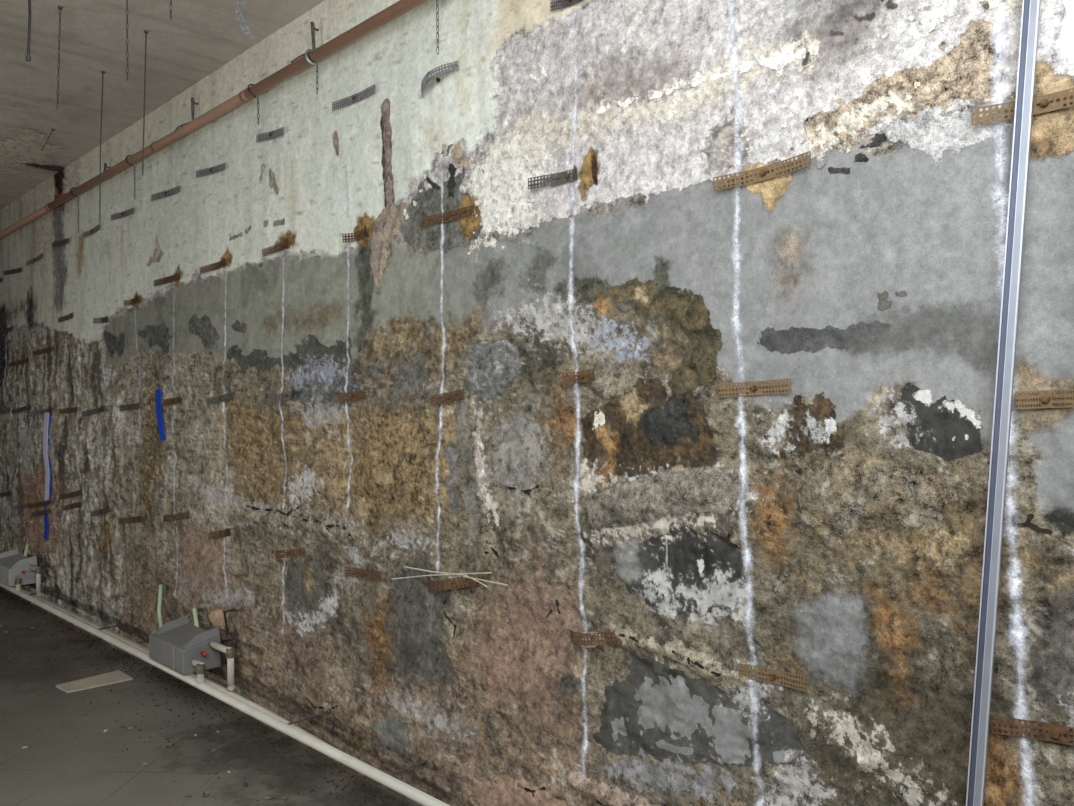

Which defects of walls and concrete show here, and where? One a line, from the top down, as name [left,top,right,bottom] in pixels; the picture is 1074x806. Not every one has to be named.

corrosion [353,213,375,247]
corrosion [458,194,481,240]
corrosion [577,147,600,201]
damp [459,31,822,527]
flaking render [368,0,1022,288]
corrosion [1030,60,1074,160]
flaking render [444,394,502,543]
damp [753,392,845,473]
damp [866,382,985,461]
damp [583,511,755,634]
flaking render [478,584,604,706]
flaking render [473,774,566,806]